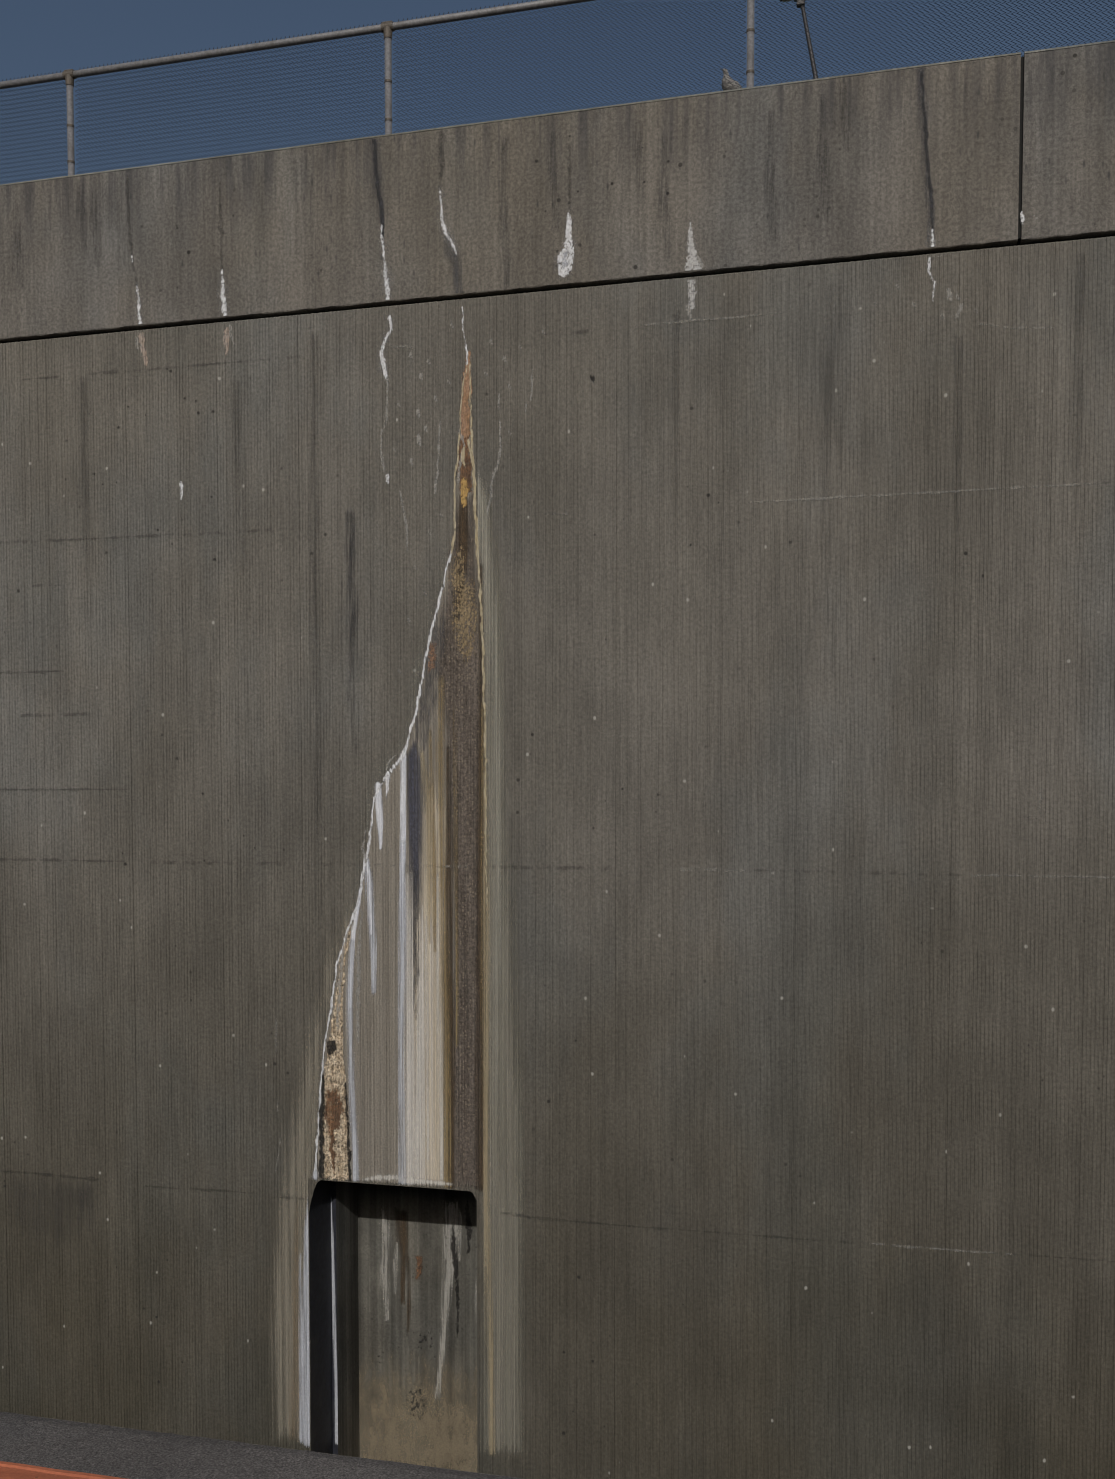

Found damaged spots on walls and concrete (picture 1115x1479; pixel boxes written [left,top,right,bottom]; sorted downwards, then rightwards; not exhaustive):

leakage [439,191,459,293]
leakage [136,290,148,366]
leakage [220,270,234,354]
leakage [687,279,697,320]
rust [457,351,472,507]
leakage [294,351,523,1472]
spalling [318,926,352,1181]